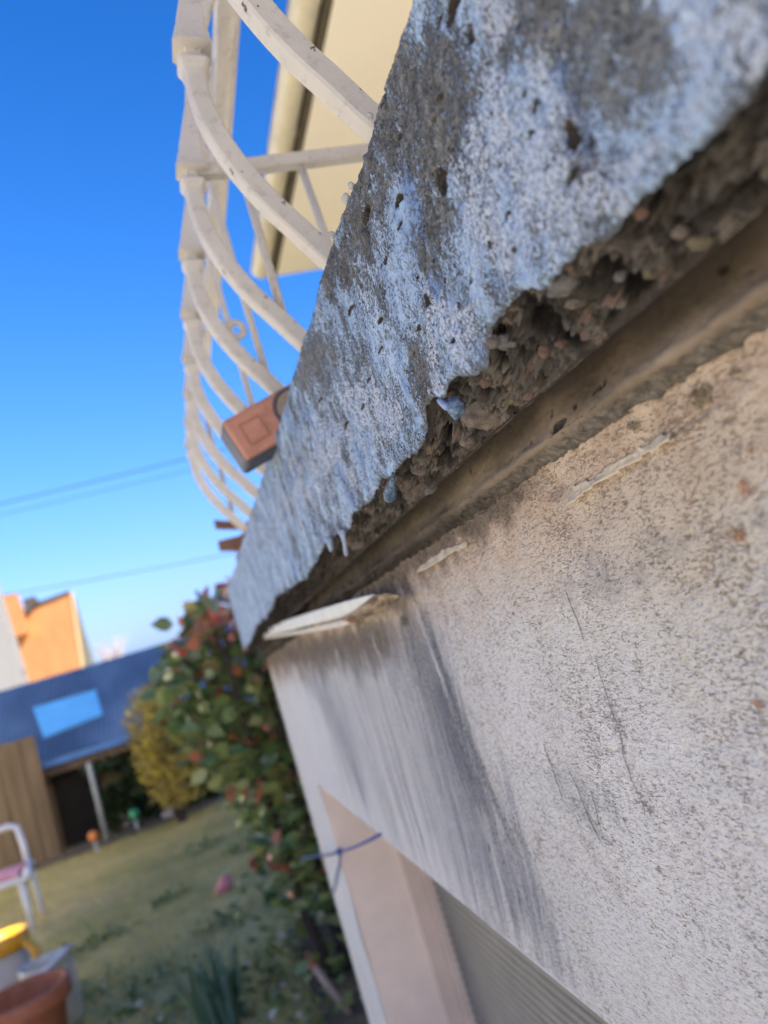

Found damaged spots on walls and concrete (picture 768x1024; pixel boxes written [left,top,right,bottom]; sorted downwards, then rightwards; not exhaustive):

leakage [266,620,390,676]
leakage [358,485,524,597]
peeling [289,0,695,414]
spalling [246,65,768,651]